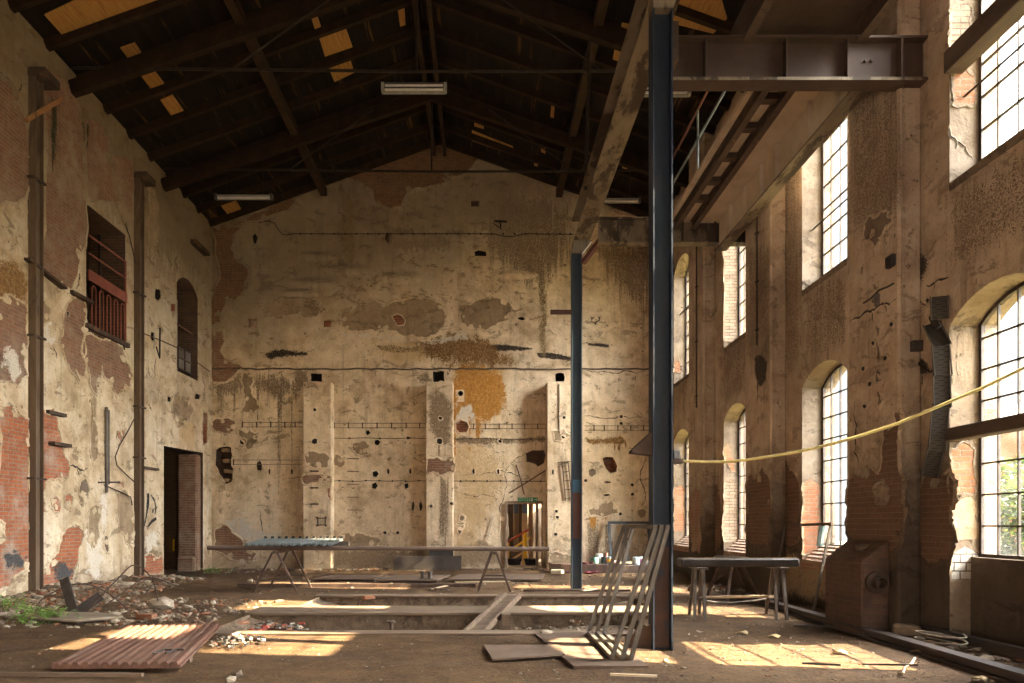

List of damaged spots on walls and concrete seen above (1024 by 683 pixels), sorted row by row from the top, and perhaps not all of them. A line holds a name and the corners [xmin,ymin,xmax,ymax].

flaking render [344,145,481,213]
crack [948,125,973,158]
flaking render [951,69,978,108]
flaking render [44,69,298,489]
damp [479,186,574,291]
crack [850,276,949,323]
flaking render [0,402,30,594]
flaking render [44,406,164,586]
corrosion [372,330,520,552]
flaking render [673,443,822,558]
flaking render [844,405,979,570]